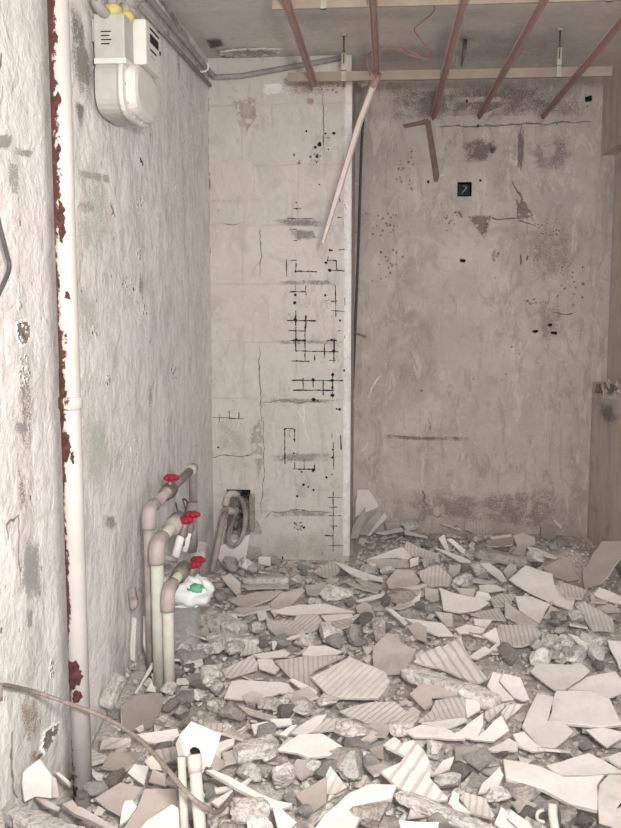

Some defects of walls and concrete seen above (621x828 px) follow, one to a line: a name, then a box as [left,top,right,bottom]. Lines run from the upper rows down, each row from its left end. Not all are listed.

rust [51,92,62,113]
rust [57,200,66,243]
spalling [15,297,31,387]
rust [59,369,67,398]
rust [60,410,74,464]
crack [213,347,330,519]
rust [68,660,83,703]